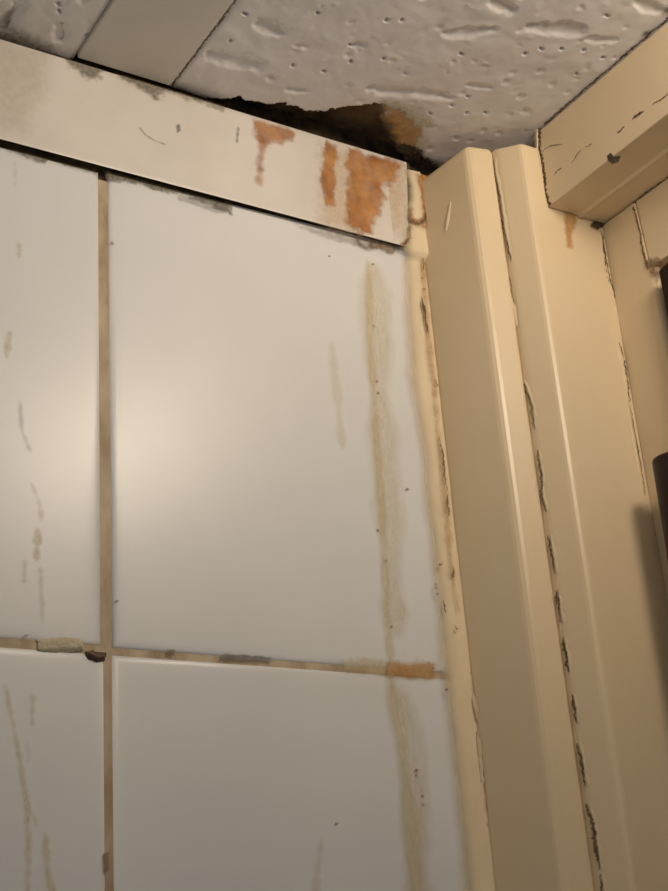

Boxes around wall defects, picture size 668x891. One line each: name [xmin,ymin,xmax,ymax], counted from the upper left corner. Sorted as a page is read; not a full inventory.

mould [0,31,50,54]
corrosion [255,121,294,141]
corrosion [321,141,336,205]
spalling [258,101,400,146]
corrosion [346,150,399,233]
crack [534,128,591,208]
crack [494,158,518,326]
crack [421,261,429,333]
crack [523,380,549,512]
crack [547,535,572,672]
corrosion [387,662,434,678]
crack [572,694,607,891]